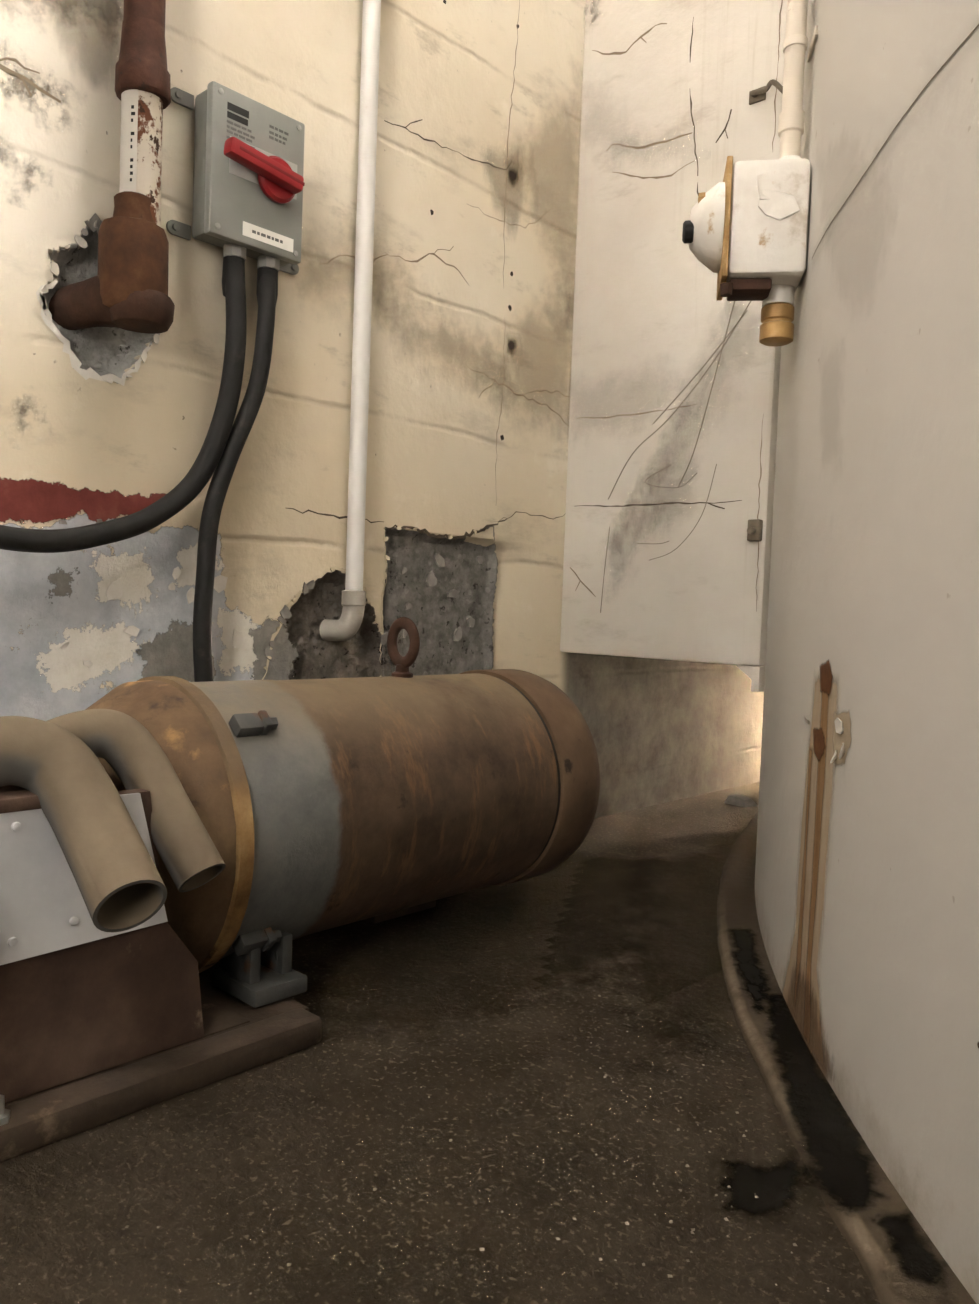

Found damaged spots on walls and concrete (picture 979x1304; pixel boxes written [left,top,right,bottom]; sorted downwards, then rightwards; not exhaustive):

water stain [1,61,51,102]
crack [0,57,61,103]
spalling [36,213,160,386]
peeling [0,477,166,529]
crack [287,508,383,523]
peeling [0,525,199,721]
spalling [211,518,508,681]
corrosion [783,660,837,1077]